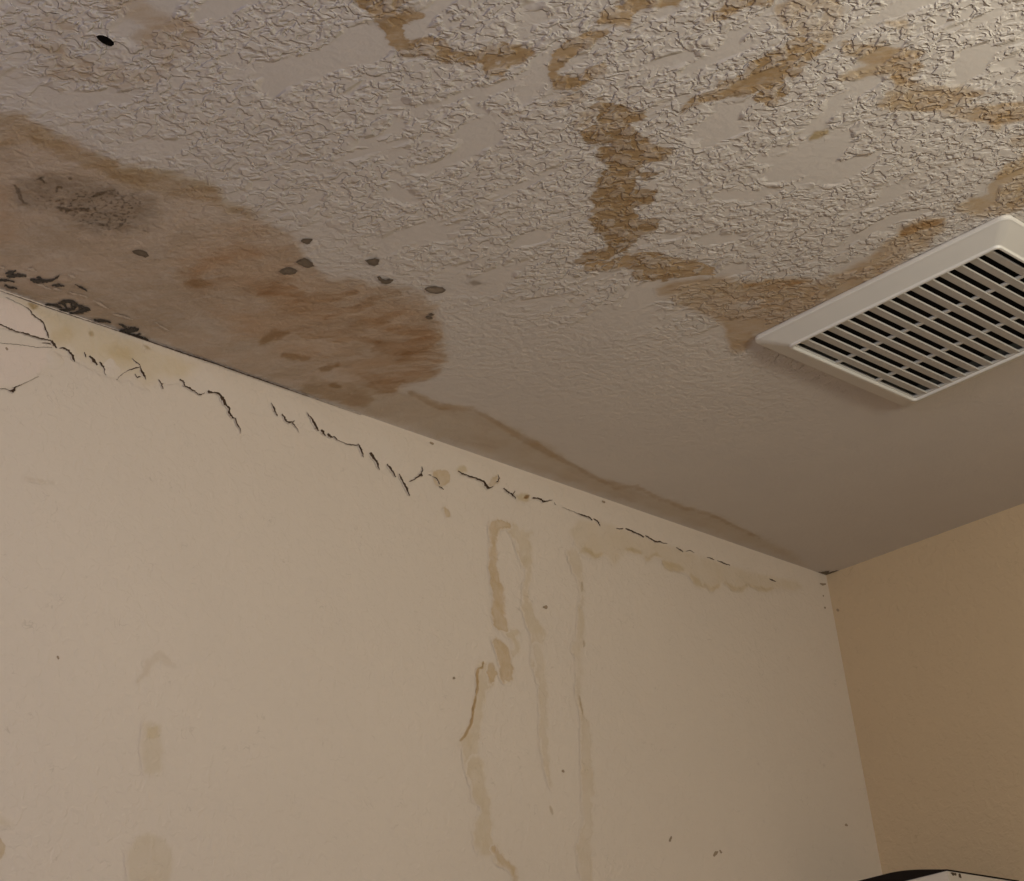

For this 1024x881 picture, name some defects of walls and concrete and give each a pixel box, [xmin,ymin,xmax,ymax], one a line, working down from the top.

leakage [0,107,453,415]
crack [0,291,730,566]
leakage [351,0,537,81]
leakage [547,0,1024,355]
leakage [457,518,554,881]
leakage [564,518,804,881]